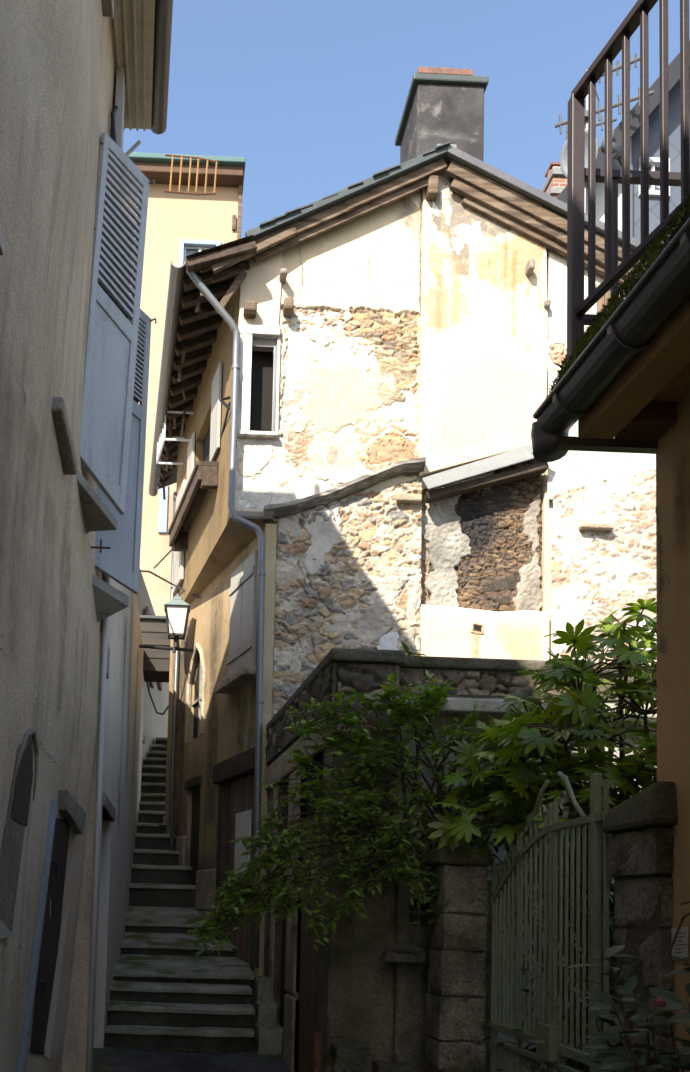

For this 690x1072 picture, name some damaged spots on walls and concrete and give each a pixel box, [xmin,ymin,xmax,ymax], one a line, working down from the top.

flaking render [404,187,484,293]
water stain [425,168,543,331]
spalling [235,306,429,718]
spalling [458,459,657,664]